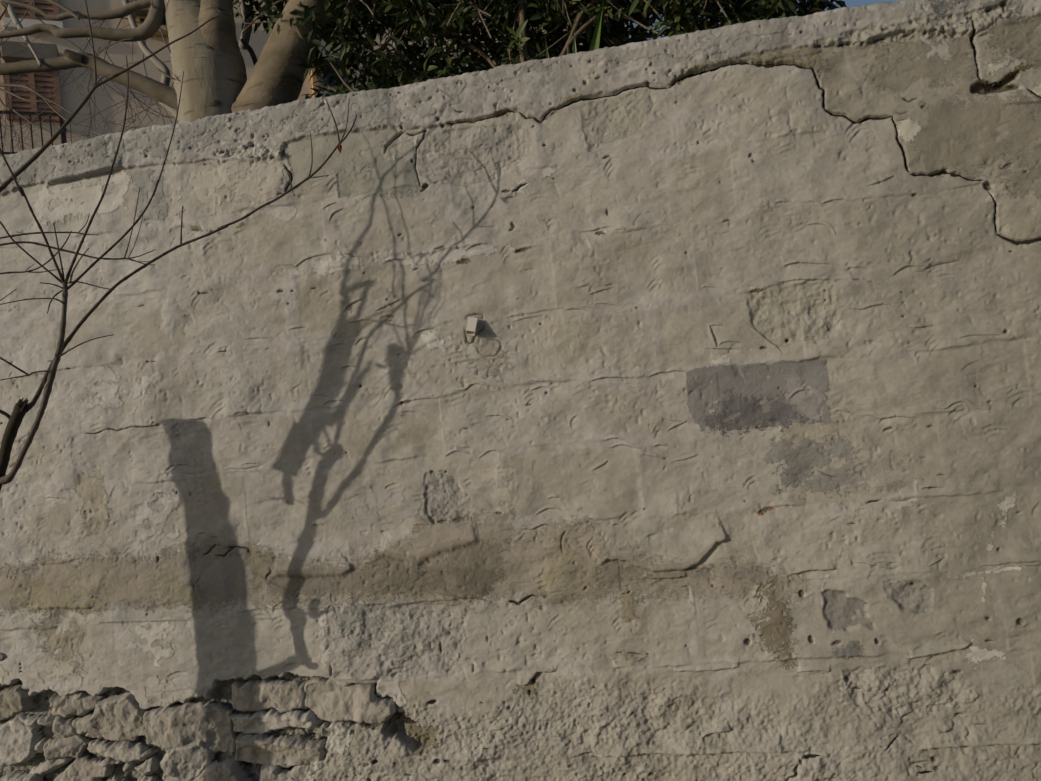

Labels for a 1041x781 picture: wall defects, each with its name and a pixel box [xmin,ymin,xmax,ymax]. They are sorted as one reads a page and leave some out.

crack [970,23,981,81]
crack [385,62,1041,245]
crack [464,314,501,357]
water stain [0,469,812,679]
spalling [0,600,467,781]